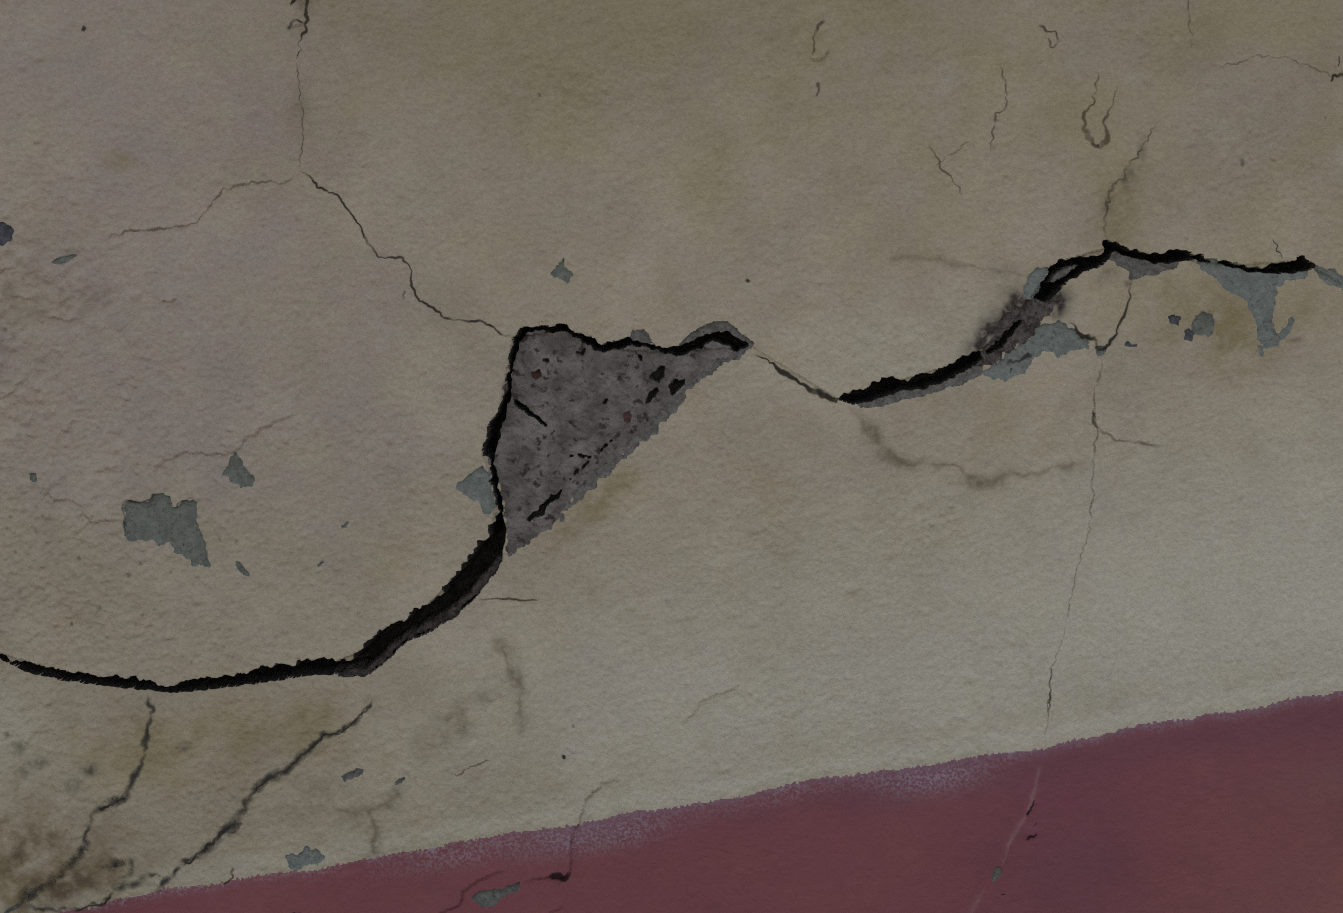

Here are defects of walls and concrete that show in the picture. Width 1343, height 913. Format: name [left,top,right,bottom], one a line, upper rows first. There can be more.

crack [288,0,309,97]
crack [1082,96,1115,148]
spalling [0,222,14,246]
flaking render [1109,252,1179,281]
spalling [1168,311,1215,341]
peeling [1196,258,1343,357]
flaking render [456,321,755,557]
peeling [122,493,211,568]
crack [0,176,1316,913]
peeling [472,882,521,907]